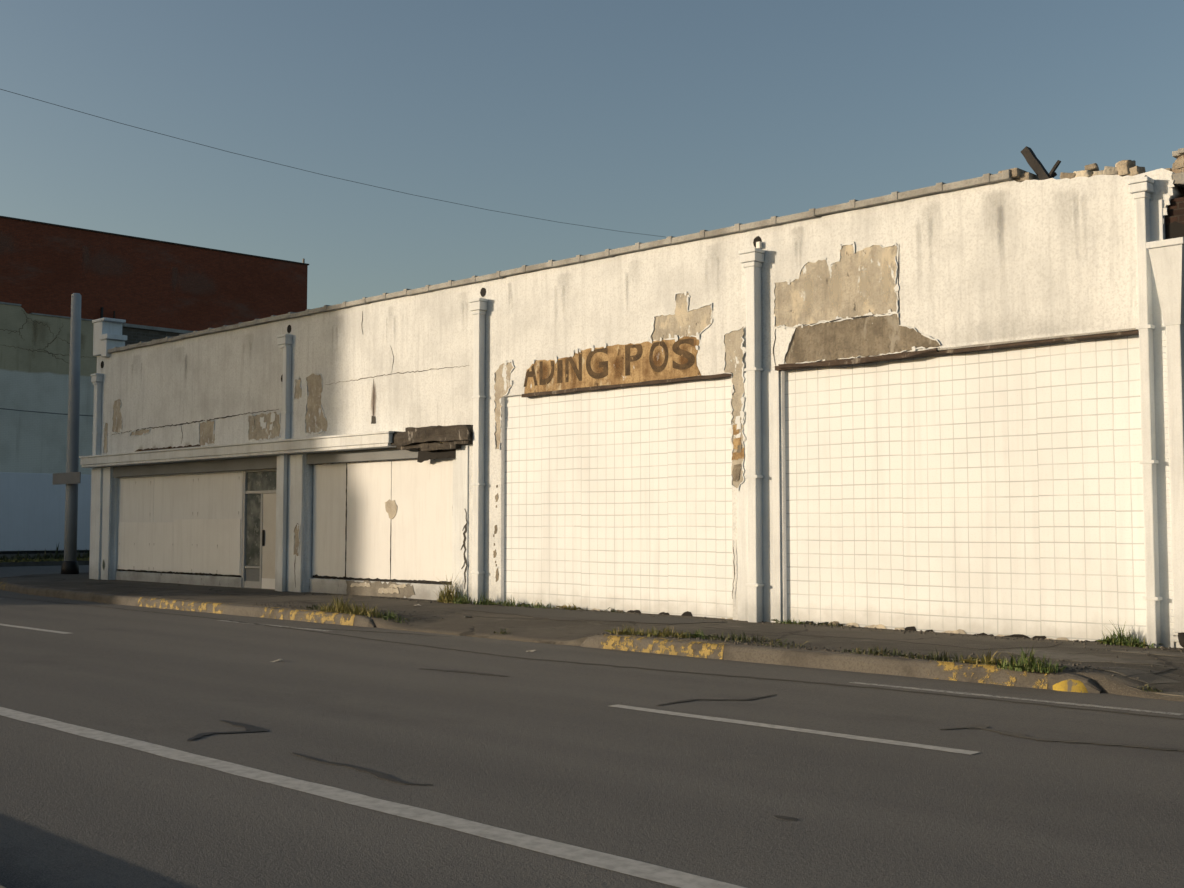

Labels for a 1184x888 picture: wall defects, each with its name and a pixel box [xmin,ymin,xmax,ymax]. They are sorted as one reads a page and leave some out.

peeling [772,242,941,364]
peeling [493,291,713,450]
peeling [103,399,151,454]
peeling [198,419,215,446]
peeling [247,411,281,441]
peeling [294,371,327,436]
peeling [723,326,746,492]
peeling [385,499,397,519]
crack [460,510,468,589]